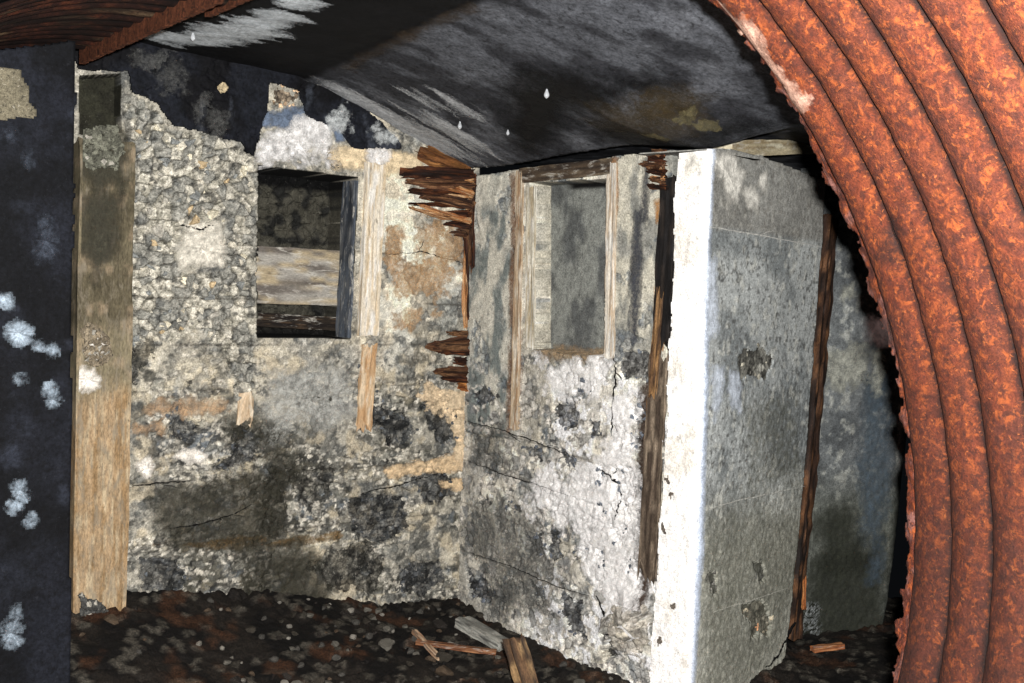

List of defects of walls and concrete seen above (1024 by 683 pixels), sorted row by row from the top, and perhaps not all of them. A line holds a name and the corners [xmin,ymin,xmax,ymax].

peeling [75,41,402,257]
leakage [505,68,680,150]
spalling [227,241,247,268]
spalling [131,277,225,397]
leakage [424,108,778,683]
crack [610,358,622,436]
spalling [738,343,772,380]
leakage [137,458,155,478]
crack [170,505,250,529]
leakage [150,367,351,599]
crack [469,421,622,520]